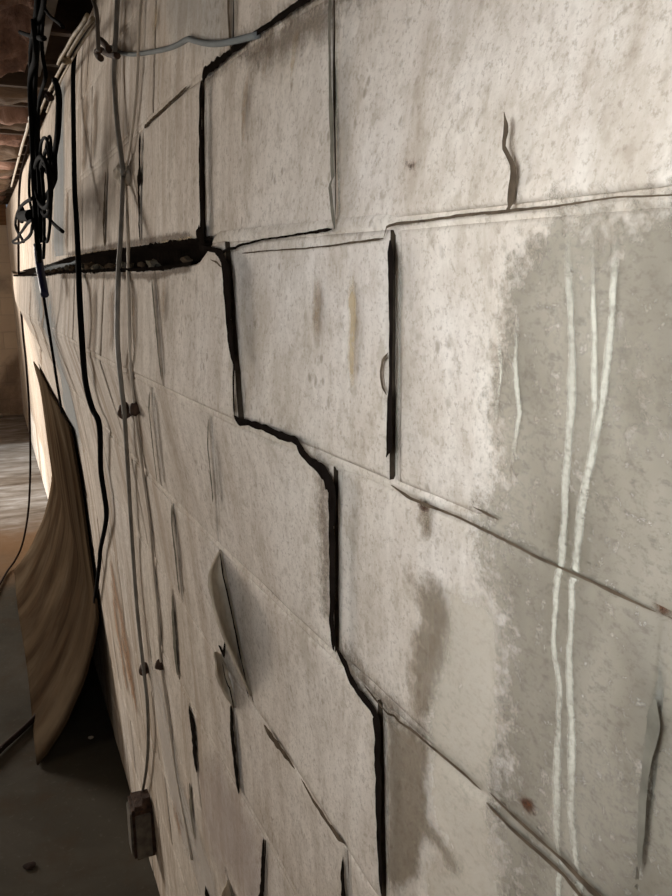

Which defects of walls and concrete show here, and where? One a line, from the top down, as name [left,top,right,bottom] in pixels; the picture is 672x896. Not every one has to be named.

crack [242,112,672,254]
crack [13,267,37,277]
crack [44,0,481,896]
damp [420,500,429,534]
crack [391,485,672,619]
damp [471,189,672,896]
damp [413,582,450,715]
damp [387,718,455,886]
crack [486,792,601,896]